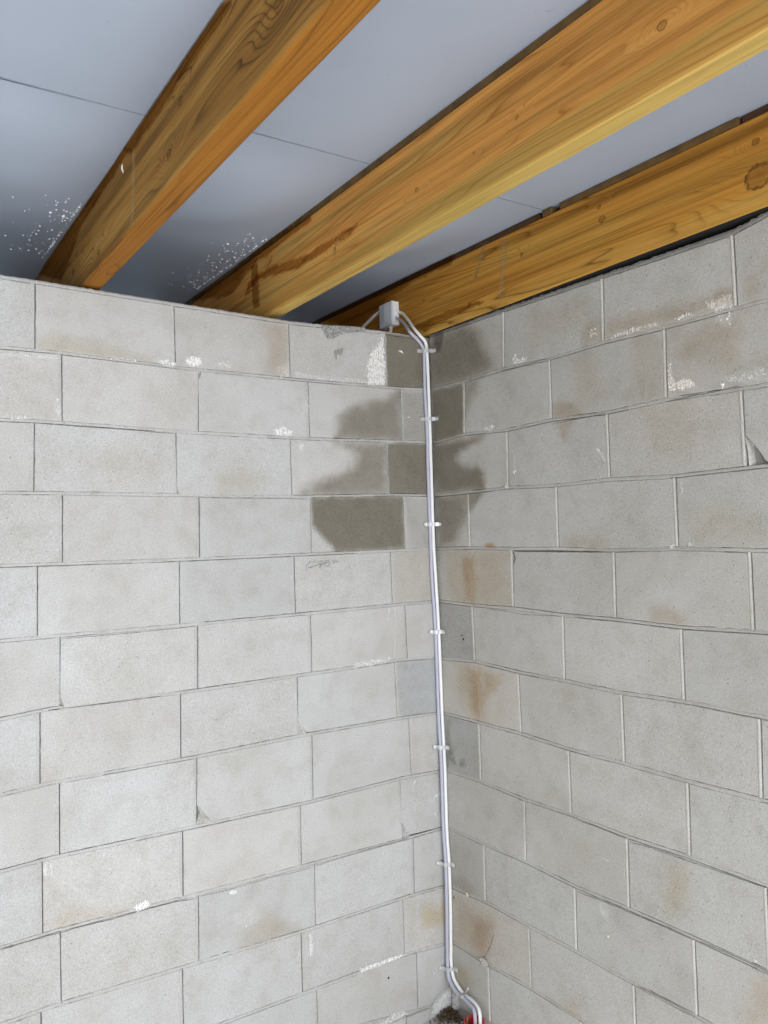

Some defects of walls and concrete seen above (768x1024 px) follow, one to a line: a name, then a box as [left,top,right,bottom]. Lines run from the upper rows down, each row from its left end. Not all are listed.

water stain [159,356,202,367]
water stain [277,336,386,386]
water stain [274,426,303,450]